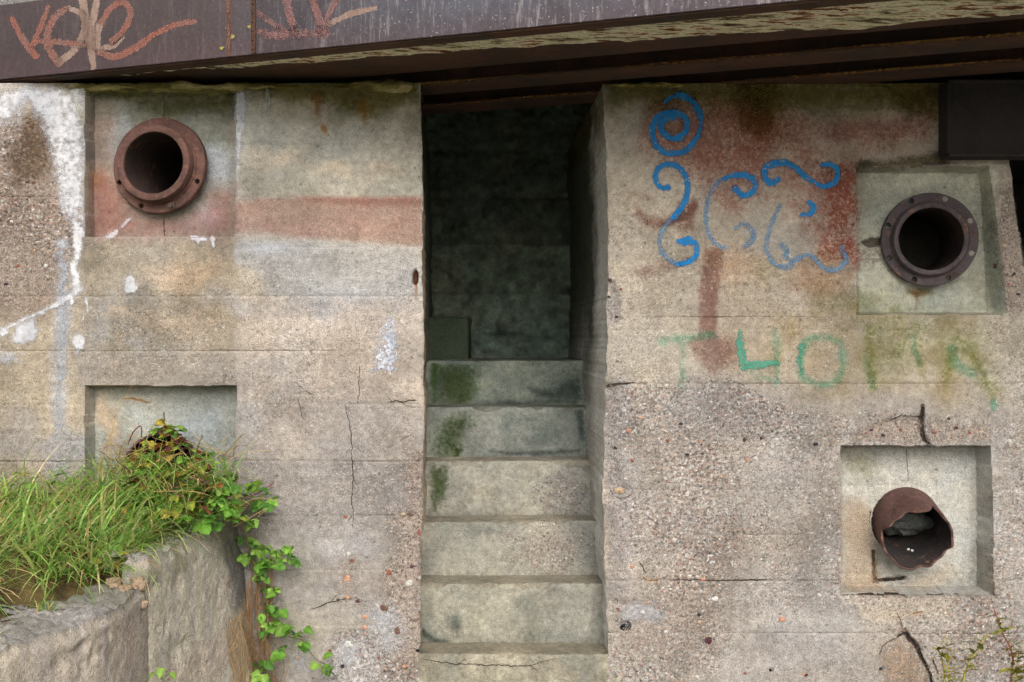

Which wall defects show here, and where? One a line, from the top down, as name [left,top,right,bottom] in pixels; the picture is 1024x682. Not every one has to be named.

damp [0,84,88,430]
crack [345,366,360,527]
crack [881,406,931,480]
crack [843,549,1011,682]